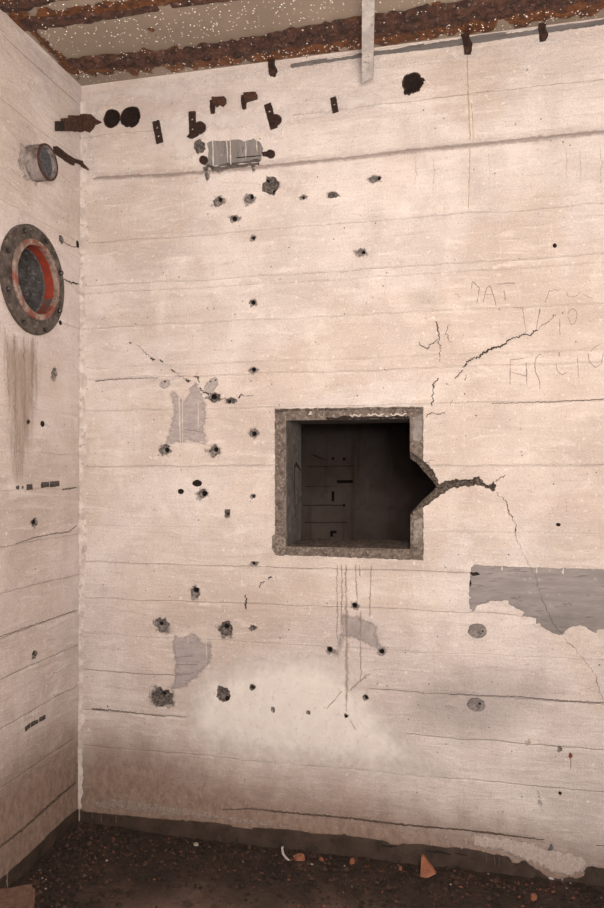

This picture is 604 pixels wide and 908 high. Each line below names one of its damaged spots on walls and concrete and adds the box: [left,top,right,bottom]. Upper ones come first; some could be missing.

rust [0,0,362,79]
rust [374,0,604,46]
crack [419,313,558,417]
peeling [158,377,237,458]
crack [451,475,604,703]
peeling [467,565,604,638]
peeling [149,617,212,707]